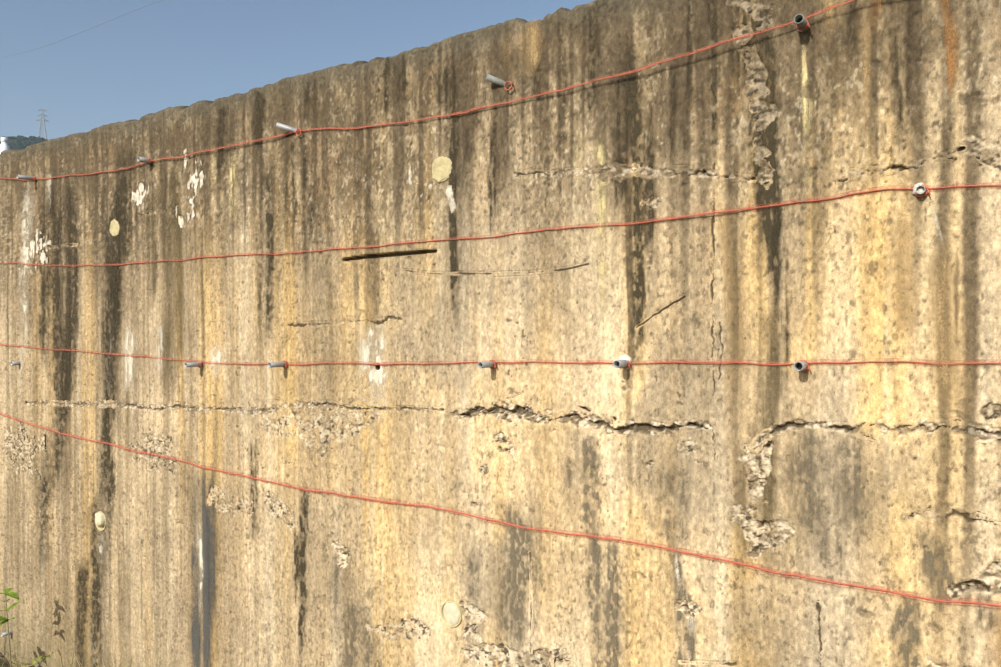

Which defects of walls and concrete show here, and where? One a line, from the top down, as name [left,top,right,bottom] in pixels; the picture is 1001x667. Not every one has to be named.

spalling [724,0,778,190]
spalling [948,133,1001,173]
crack [24,161,759,469]
damp [21,179,78,539]
spalling [1,417,45,483]
damp [75,158,133,667]
crack [748,415,1001,453]
spalling [206,484,298,535]
spalling [728,433,796,560]
spalling [945,559,1001,599]
spalling [364,615,432,643]
spalling [454,597,573,667]